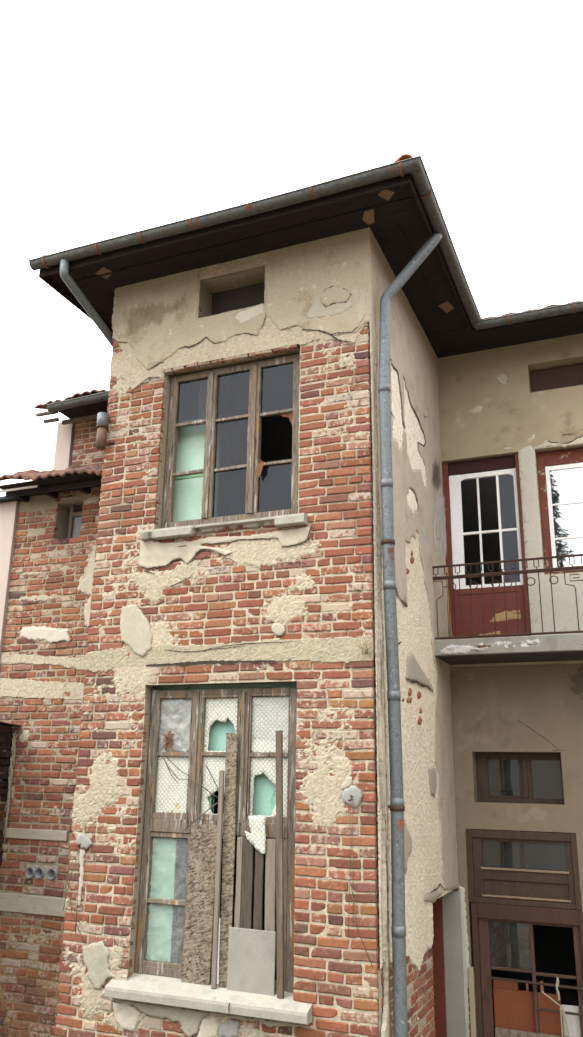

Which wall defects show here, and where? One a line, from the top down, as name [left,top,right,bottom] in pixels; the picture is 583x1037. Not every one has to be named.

crack [131,314,357,391]
flaking render [391,366,427,512]
flaking render [139,527,311,569]
spalling [440,645,490,654]
flaking render [402,688,422,725]
flaking render [109,998,301,1037]